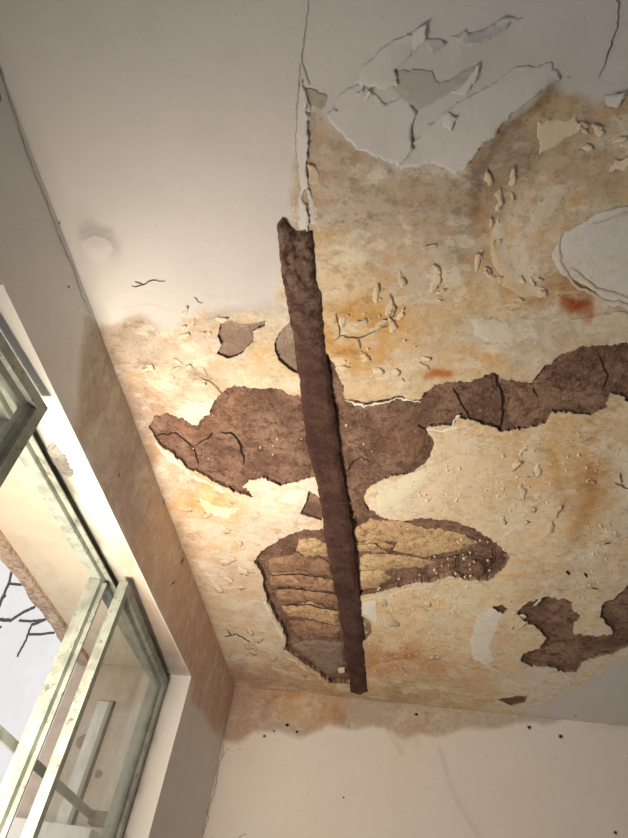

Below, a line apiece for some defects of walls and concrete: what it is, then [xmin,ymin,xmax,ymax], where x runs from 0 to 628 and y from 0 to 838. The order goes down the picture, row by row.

crack [599,0,620,77]
peeling [291,17,560,232]
peeling [537,116,606,154]
rust [277,220,315,293]
peeling [552,206,628,310]
spalling [201,316,265,358]
spalling [274,323,297,373]
damp [55,76,628,750]
spalling [327,342,628,607]
spalling [149,385,349,688]
spalling [493,586,628,673]
spalling [498,695,527,705]